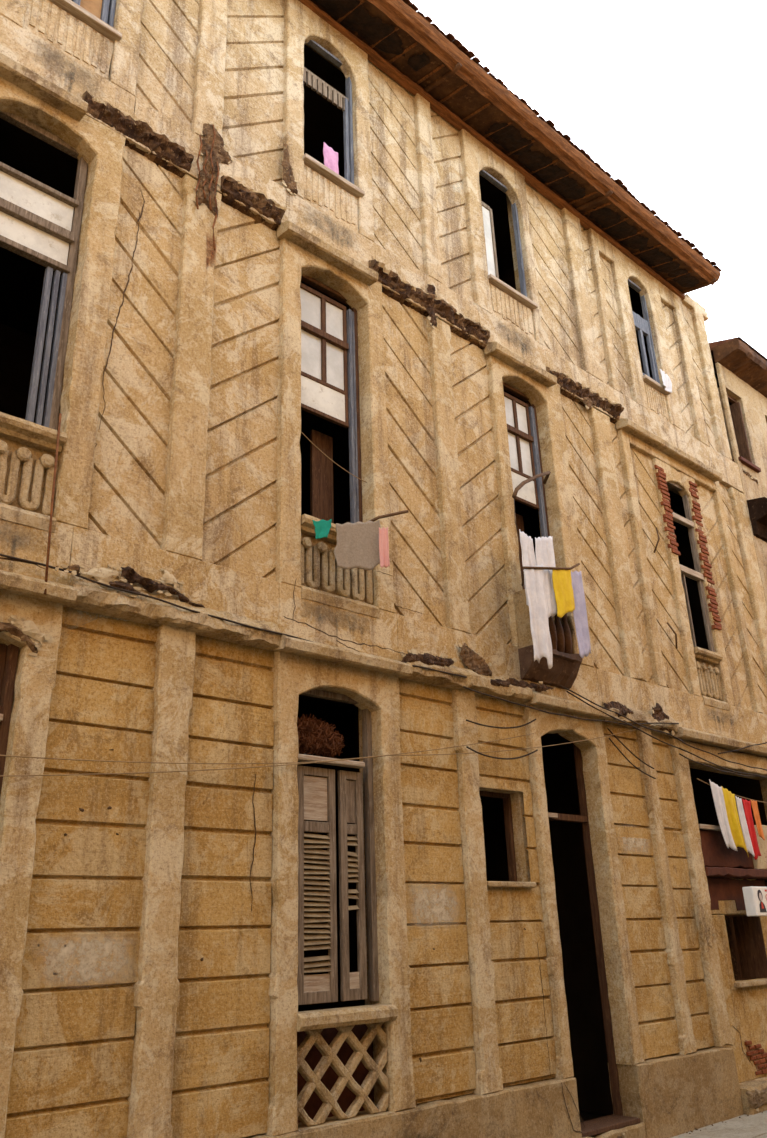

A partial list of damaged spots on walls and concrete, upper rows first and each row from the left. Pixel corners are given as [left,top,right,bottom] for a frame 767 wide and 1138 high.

spalling [186,123,234,250]
spalling [281,143,298,196]
spalling [426,284,438,329]
spalling [55,563,205,608]
peeling [0,615,53,657]
spalling [400,643,555,693]
spalling [603,701,634,721]
spalling [652,703,675,735]
flaking render [744,1040,767,1111]